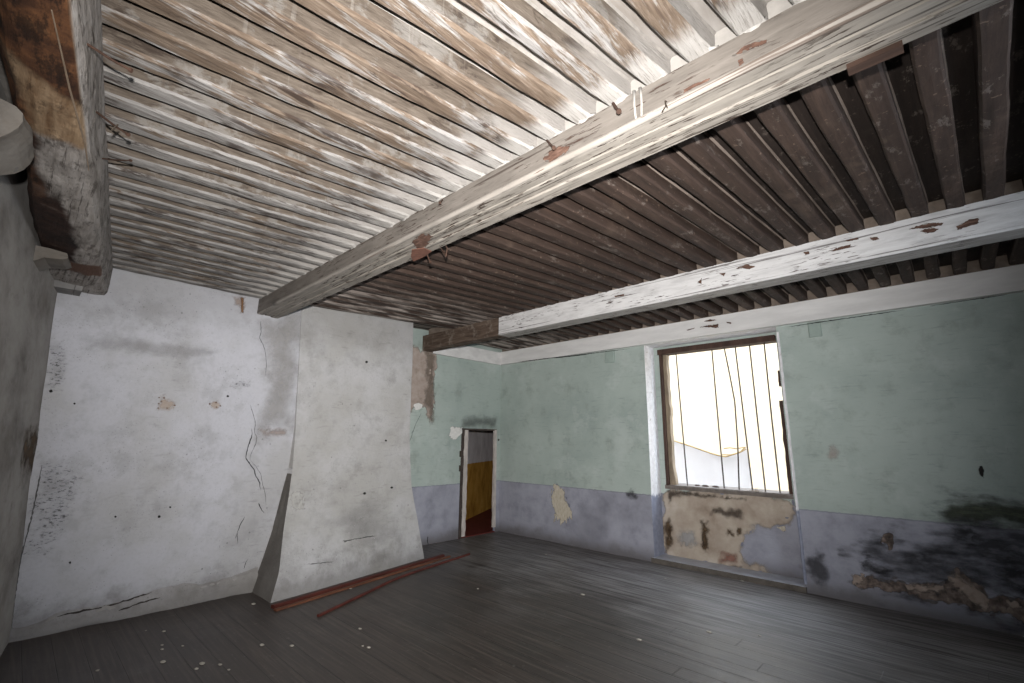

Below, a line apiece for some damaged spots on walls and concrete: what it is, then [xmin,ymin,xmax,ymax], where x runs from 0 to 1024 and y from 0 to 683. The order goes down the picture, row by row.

peeling [911,223,943,234]
peeling [956,218,979,230]
flaking render [411,347,437,419]
crack [235,409,266,568]
peeling [551,484,572,526]
peeling [663,489,795,573]
water stain [806,555,828,580]
spalling [852,567,1024,624]
water stain [862,498,1024,600]